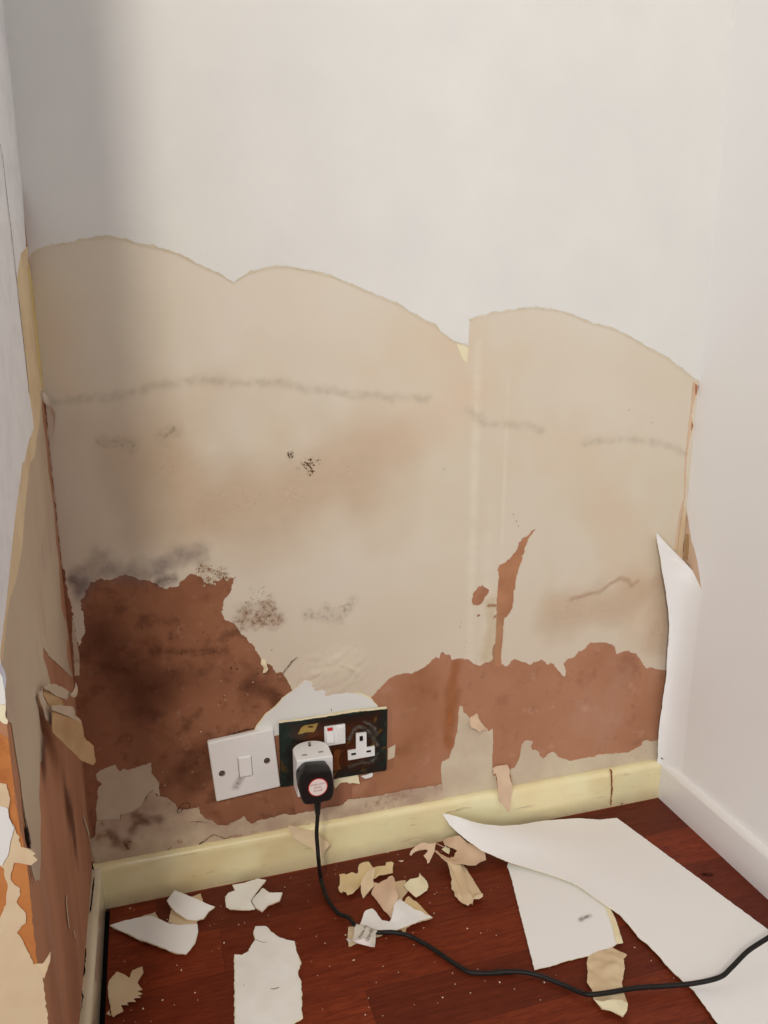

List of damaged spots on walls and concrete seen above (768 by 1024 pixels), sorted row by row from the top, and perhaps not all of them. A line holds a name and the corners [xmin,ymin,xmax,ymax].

flaking render [38,481,702,864]
flaking render [0,733,24,847]
crack [607,769,615,805]
flaking render [0,863,37,964]